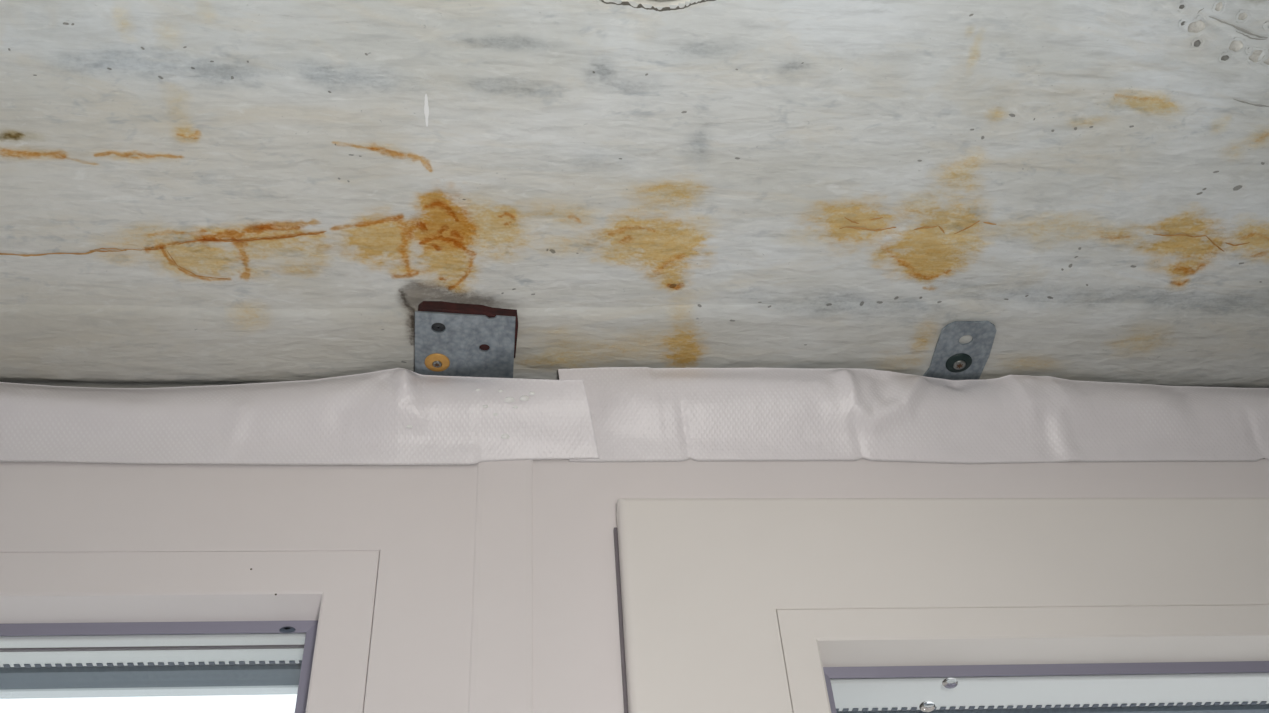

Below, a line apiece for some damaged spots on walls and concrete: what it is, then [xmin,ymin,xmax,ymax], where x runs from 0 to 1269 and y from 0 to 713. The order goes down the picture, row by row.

spalling [594,0,729,15]